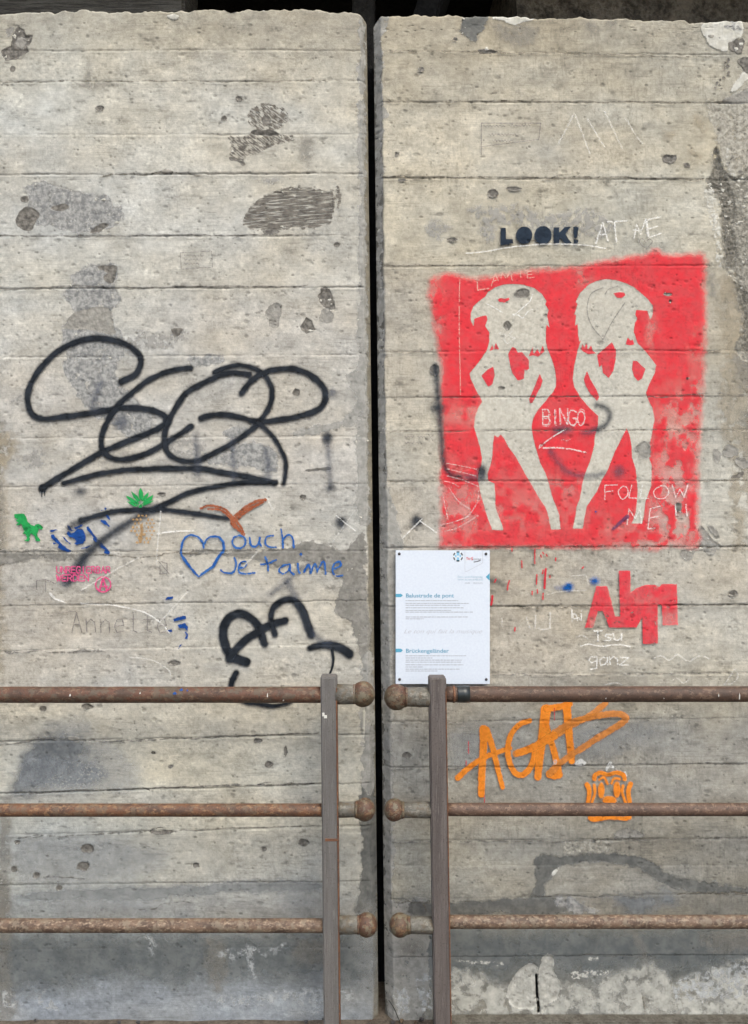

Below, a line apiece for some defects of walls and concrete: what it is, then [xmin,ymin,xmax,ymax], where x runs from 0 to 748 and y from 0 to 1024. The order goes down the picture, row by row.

spalling [704,43,748,362]
water stain [13,734,104,796]
water stain [450,929,748,1014]